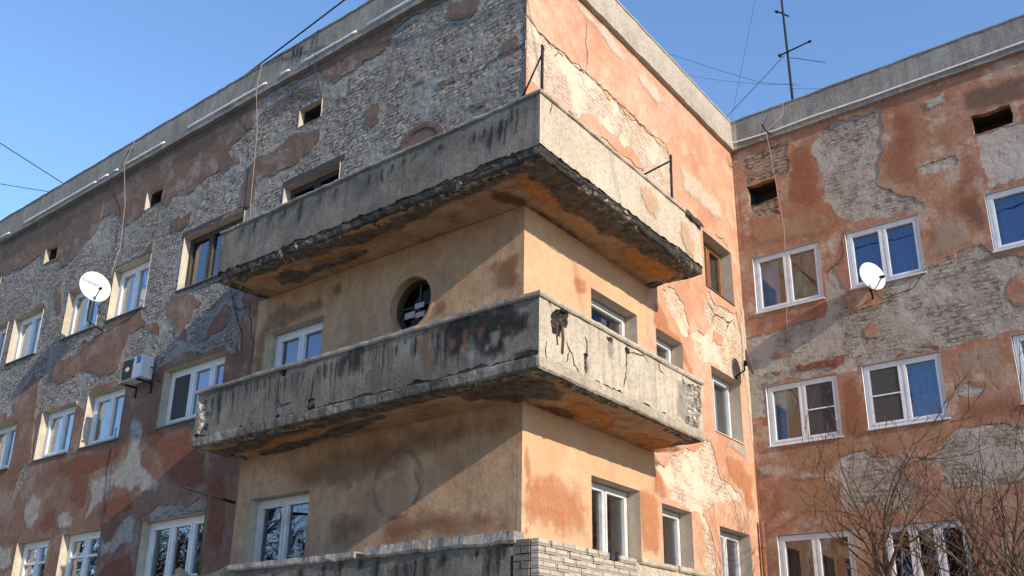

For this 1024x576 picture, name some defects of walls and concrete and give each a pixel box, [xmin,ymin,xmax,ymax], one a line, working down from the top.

peeling [0,0,700,499]
water stain [461,108,527,150]
crack [467,15,670,155]
peeling [750,198,781,220]
peeling [809,108,925,222]
peeling [975,122,1024,188]
water stain [317,336,417,398]
water stain [431,305,531,363]
peeling [661,244,1024,419]
peeling [85,419,160,519]
peeling [655,378,743,576]
peeling [835,422,1024,512]